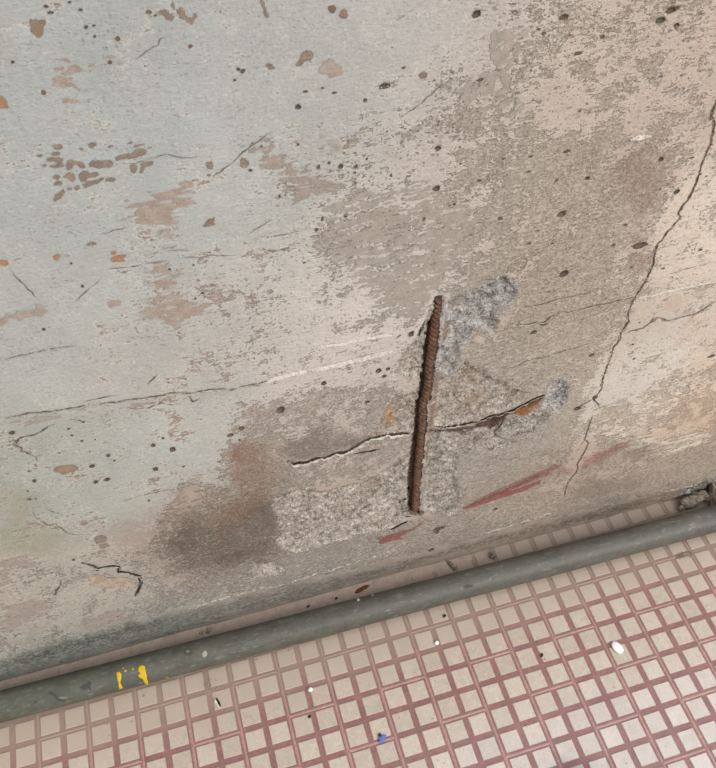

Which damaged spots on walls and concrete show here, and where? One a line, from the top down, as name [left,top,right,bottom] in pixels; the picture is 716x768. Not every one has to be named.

peeling [36,141,153,201]
crack [505,103,716,494]
peeling [240,137,572,553]
crack [6,375,268,458]
crack [429,395,545,436]
crack [288,432,410,467]
crack [82,562,143,597]